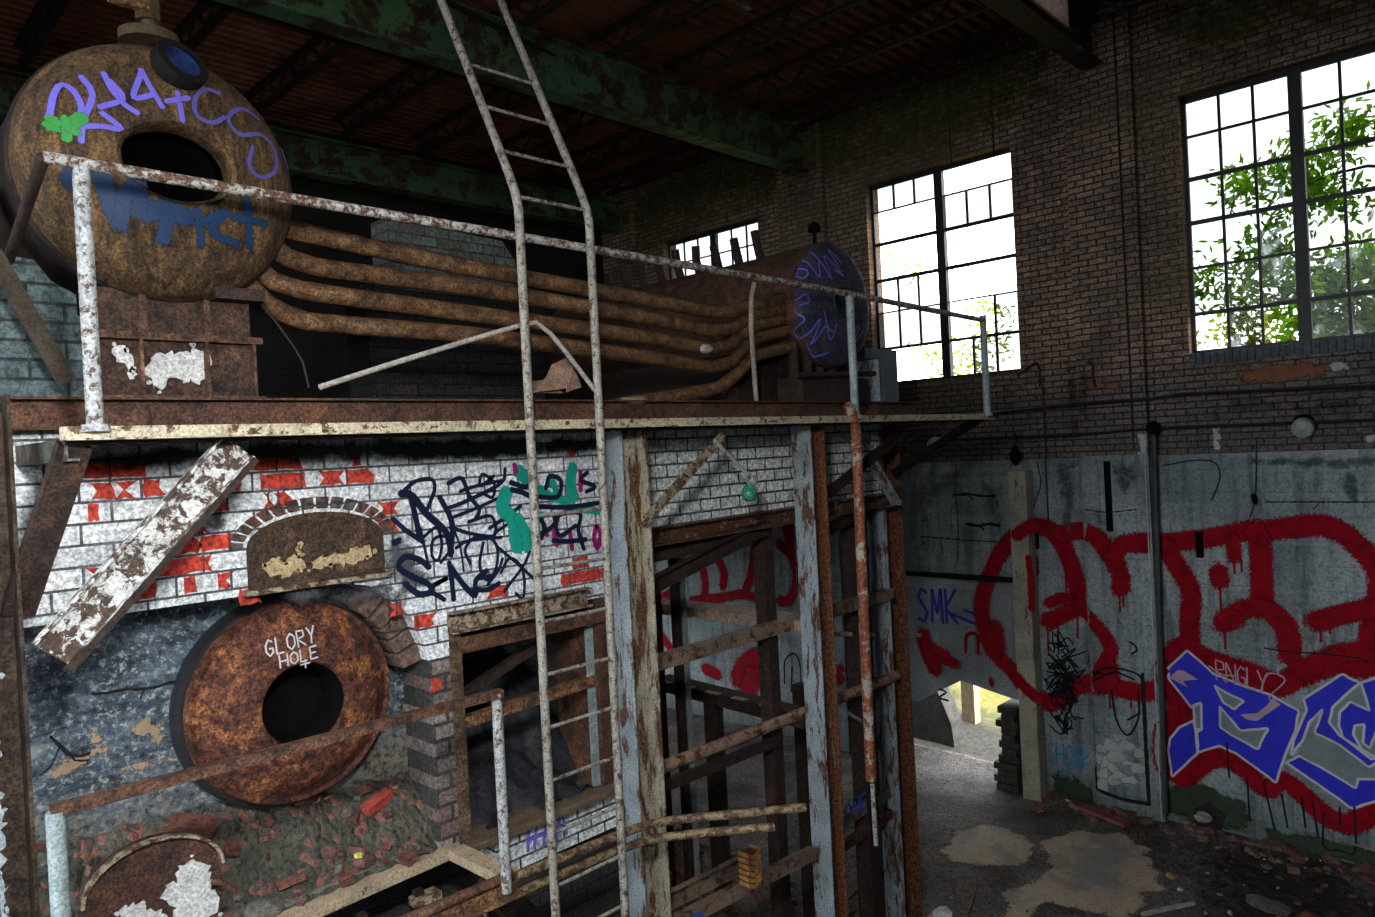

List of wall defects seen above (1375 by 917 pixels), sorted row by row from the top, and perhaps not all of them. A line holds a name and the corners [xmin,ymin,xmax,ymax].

peeling [112,342,212,394]
peeling [67,419,983,522]
peeling [377,500,399,532]
peeling [137,526,261,606]
peeling [262,541,377,579]
peeling [485,583,508,600]
peeling [560,555,603,587]
peeling [0,792,9,917]
peeling [113,855,223,917]